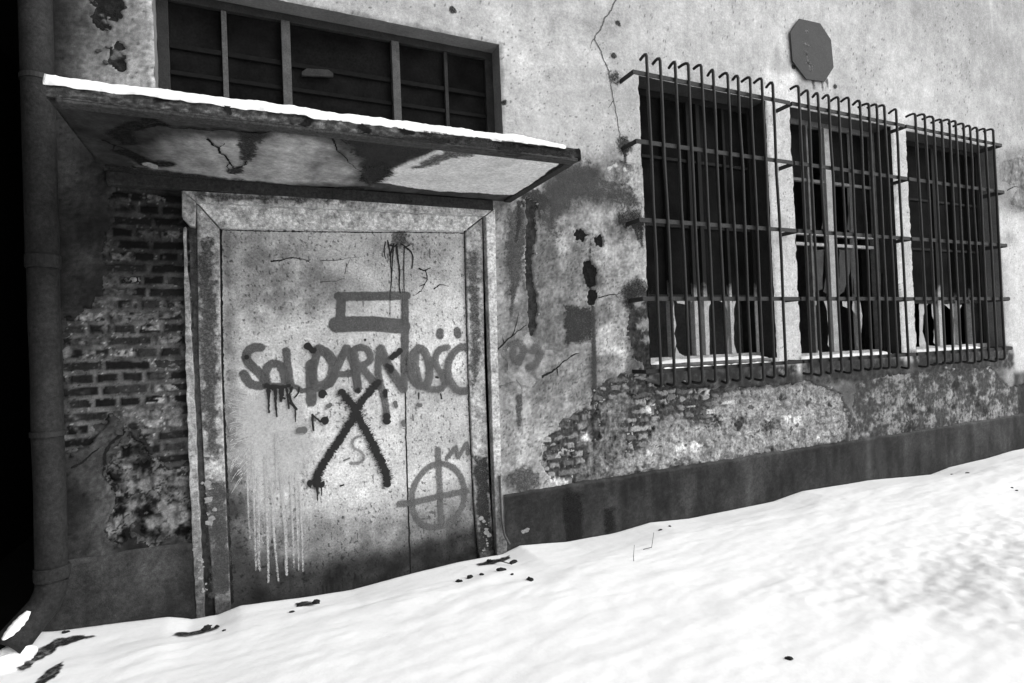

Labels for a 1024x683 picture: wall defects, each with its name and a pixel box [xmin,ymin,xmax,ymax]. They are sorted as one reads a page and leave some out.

peeling [89,0,127,72]
crack [101,106,270,171]
leakage [303,135,640,316]
crack [591,0,622,146]
flaking render [62,187,217,593]
flaking render [541,291,1024,485]